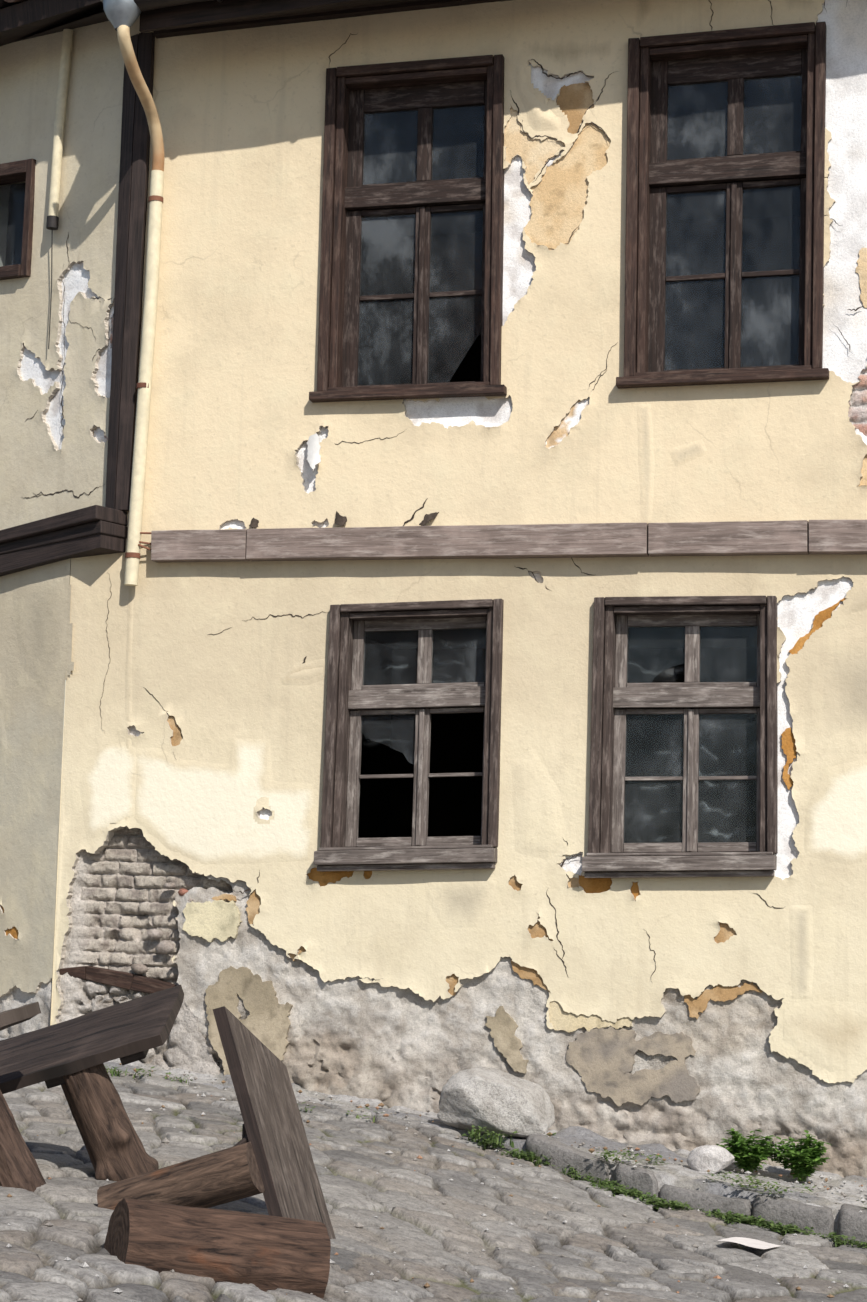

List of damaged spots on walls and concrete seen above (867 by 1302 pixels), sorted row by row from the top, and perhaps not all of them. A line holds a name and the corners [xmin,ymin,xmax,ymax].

peeling [503,63,611,326]
flaking render [817,0,867,487]
flaking render [20,262,114,450]
flaking render [296,427,329,494]
flaking render [404,396,513,429]
peeling [546,397,590,449]
crack [208,611,323,635]
flaking render [773,577,853,880]
crack [546,839,581,976]
spalling [0,827,867,1178]